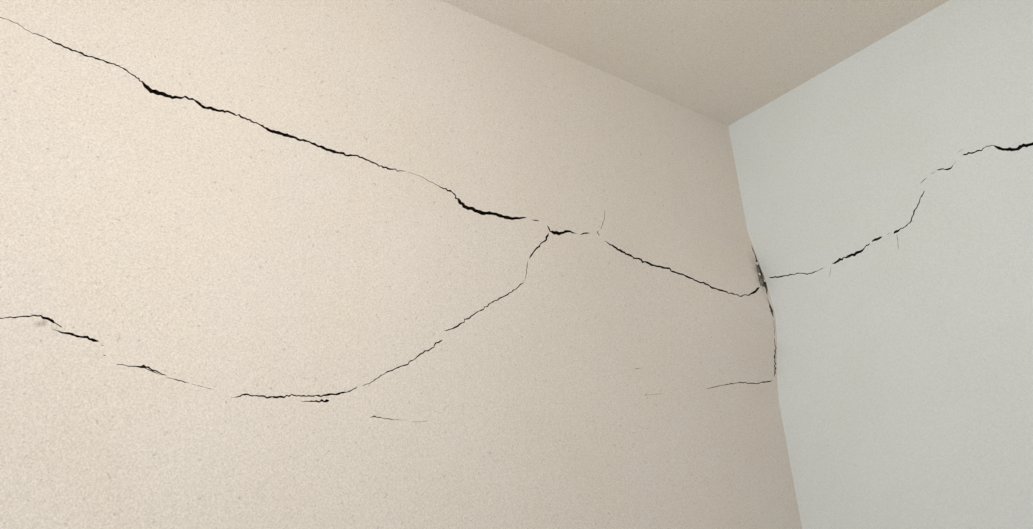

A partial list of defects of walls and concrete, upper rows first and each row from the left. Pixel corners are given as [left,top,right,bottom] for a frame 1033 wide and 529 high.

crack [0,17,1033,403]